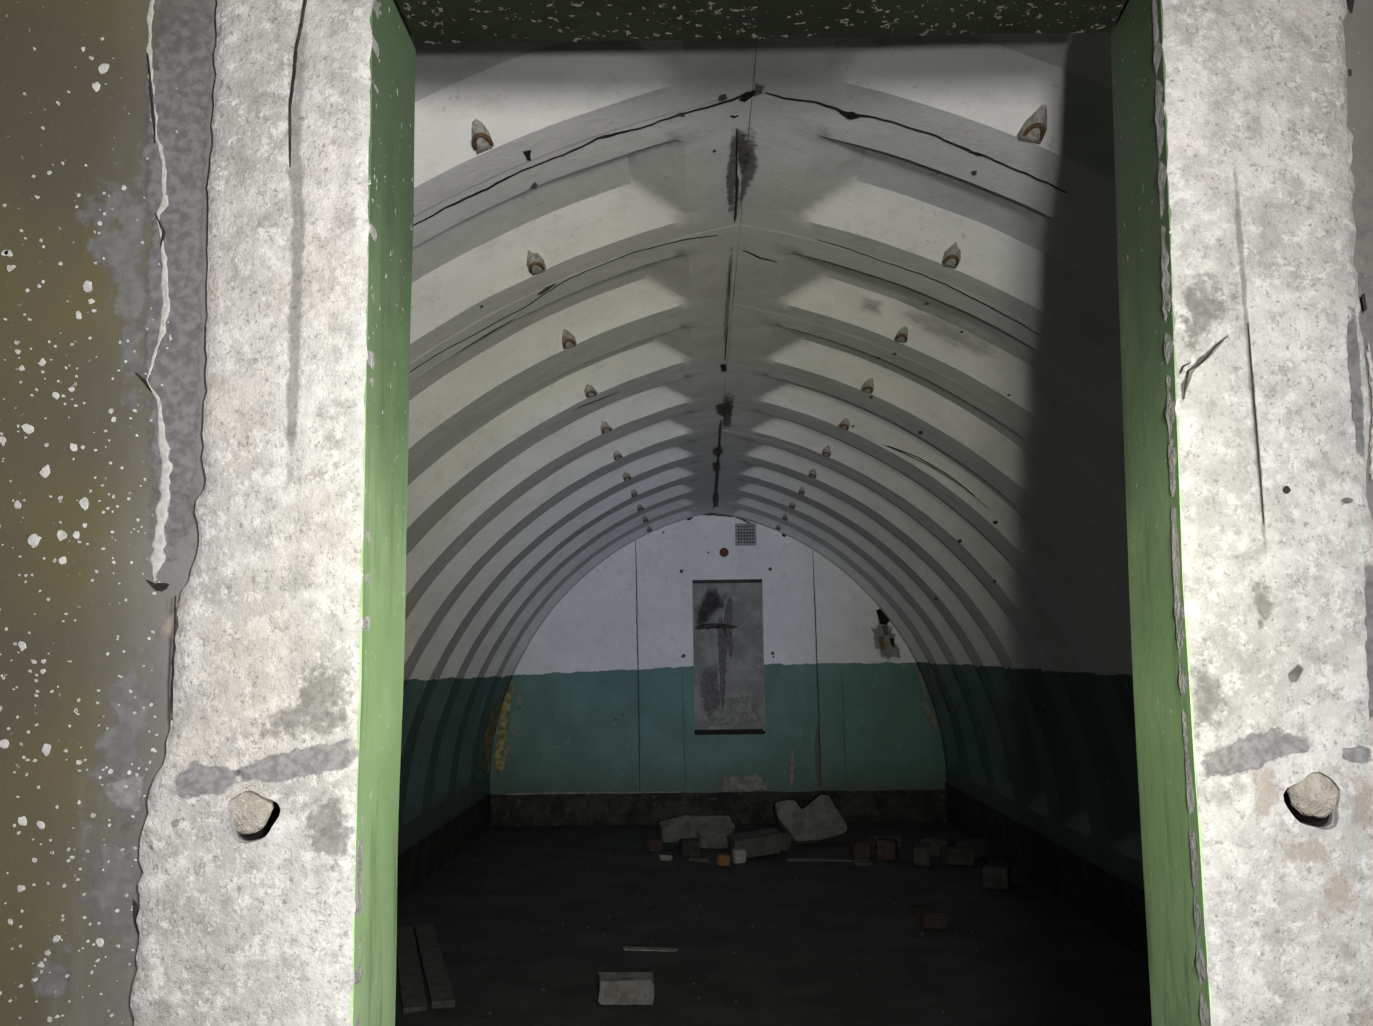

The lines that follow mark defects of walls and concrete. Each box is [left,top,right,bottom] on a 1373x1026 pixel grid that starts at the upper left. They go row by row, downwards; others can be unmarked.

peeling [0,0,213,604]
crack [135,0,173,591]
crack [289,0,307,167]
crack [410,90,1068,507]
damp [726,134,757,211]
crack [1180,275,1265,524]
peeling [0,596,176,1022]
peeling [1365,566,1373,718]